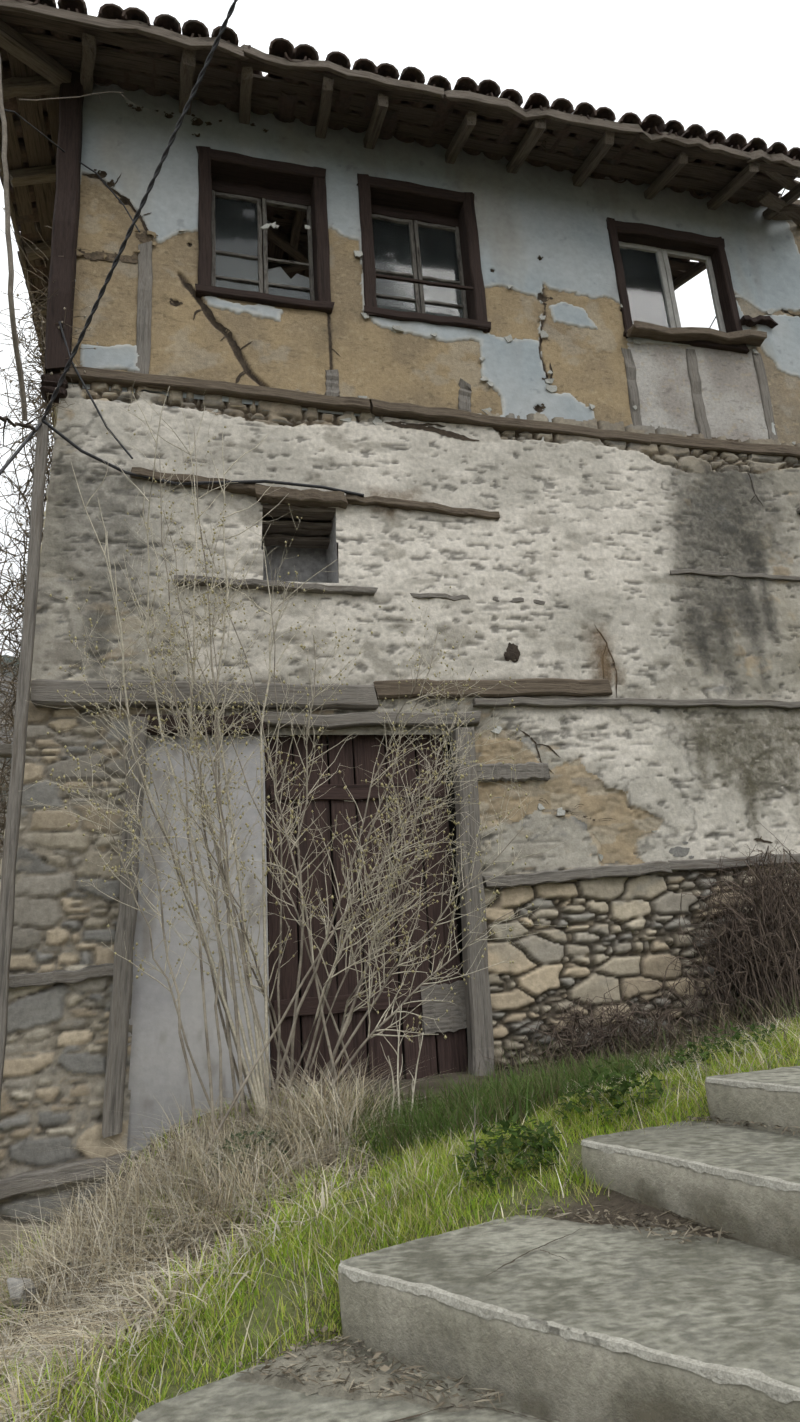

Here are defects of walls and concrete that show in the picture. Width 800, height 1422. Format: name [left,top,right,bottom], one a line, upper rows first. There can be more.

crack [84,174,150,232]
crack [180,277,262,386]
flaking render [71,169,800,473]
leakage [684,473,774,648]
leakage [677,711,800,819]
crack [485,1228,581,1277]
crack [389,1396,550,1422]